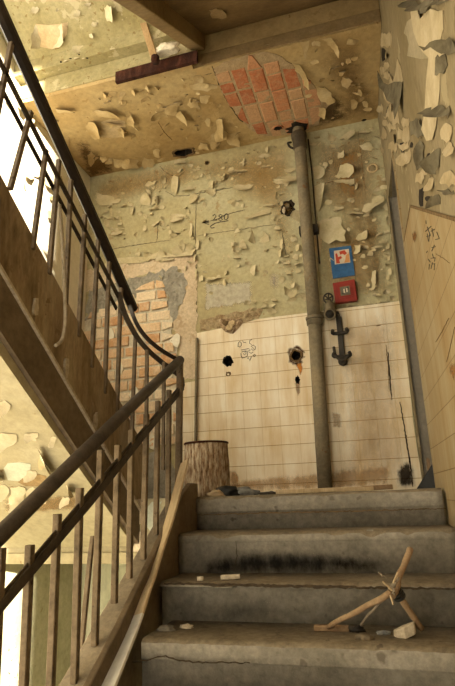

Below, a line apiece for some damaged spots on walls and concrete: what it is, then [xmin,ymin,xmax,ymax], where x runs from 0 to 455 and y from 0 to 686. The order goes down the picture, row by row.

flaking render [84,0,455,450]
crack [386,346,413,487]
peeling [0,433,38,453]
peeling [0,450,51,513]
leakage [398,464,412,485]
peeling [59,485,75,509]
leakage [207,555,373,572]
crack [133,655,250,664]